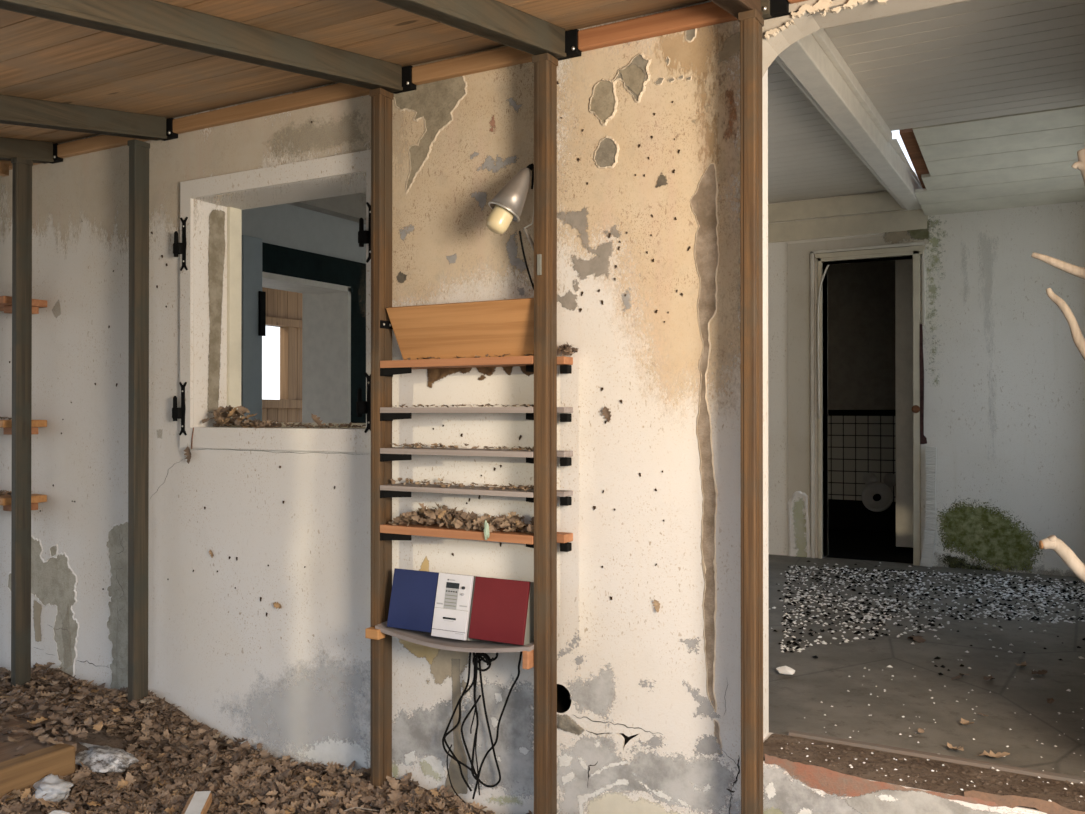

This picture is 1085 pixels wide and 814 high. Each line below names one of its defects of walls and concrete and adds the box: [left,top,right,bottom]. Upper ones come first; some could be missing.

spalling [764,0,888,40]
spalling [392,76,468,194]
spalling [589,53,692,169]
peeling [557,208,621,311]
damp [557,20,740,398]
spalling [31,535,79,677]
spalling [105,520,128,690]
damp [297,736,370,771]
crack [574,715,663,735]
flaking render [765,754,1085,814]